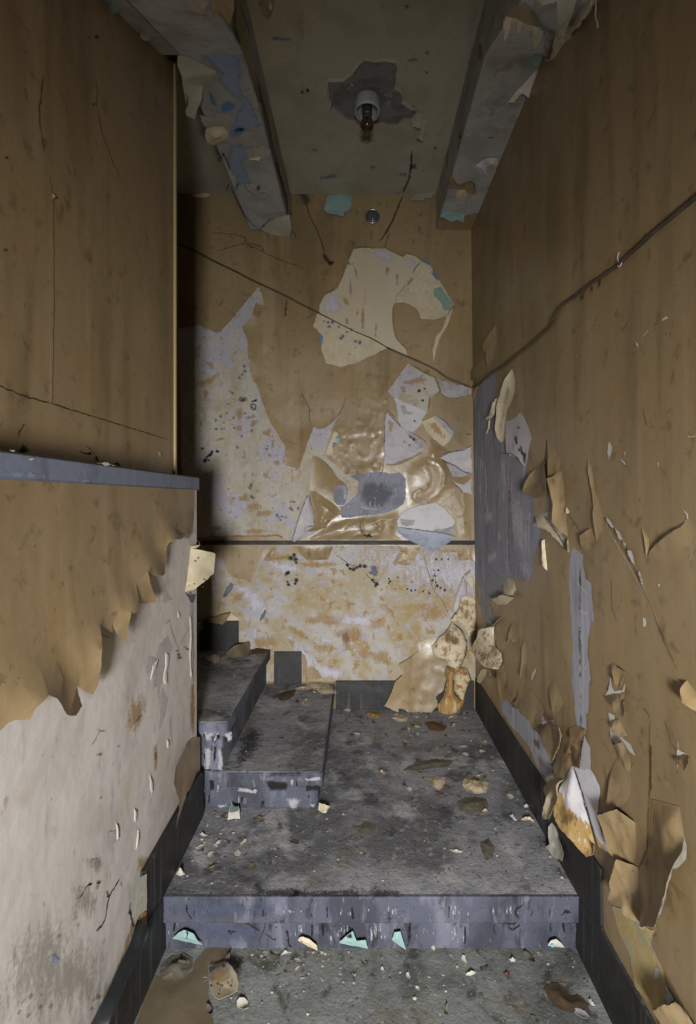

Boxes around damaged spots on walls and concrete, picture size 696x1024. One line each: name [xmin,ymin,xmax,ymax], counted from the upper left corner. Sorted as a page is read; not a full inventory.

peeling [177,55,216,119]
peeling [189,0,292,237]
spalling [326,58,428,141]
peeling [502,0,594,116]
peeling [440,190,468,223]
water stain [234,586,278,615]
water stain [268,553,301,586]
water stain [288,636,353,680]
peeling [0,241,696,1024]
water stain [328,545,475,598]